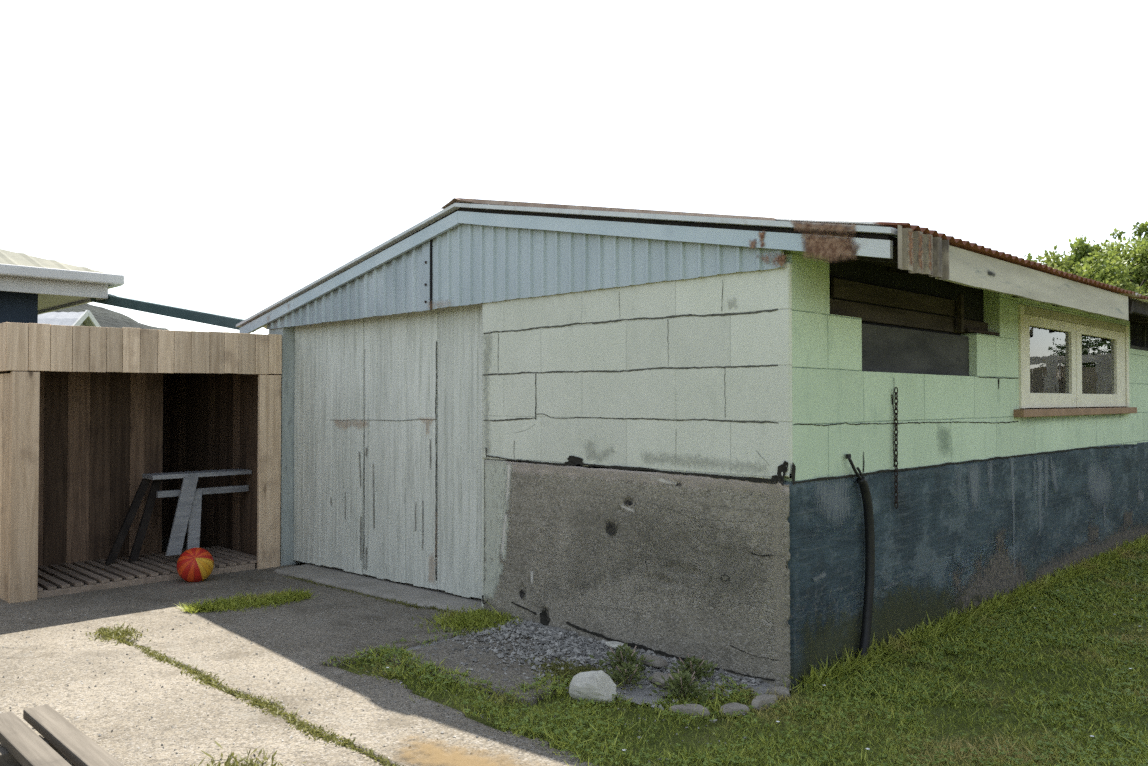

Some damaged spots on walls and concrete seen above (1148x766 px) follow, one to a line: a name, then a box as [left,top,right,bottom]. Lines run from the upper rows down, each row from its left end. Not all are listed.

corrosion [750,232,786,266]
corrosion [793,221,858,260]